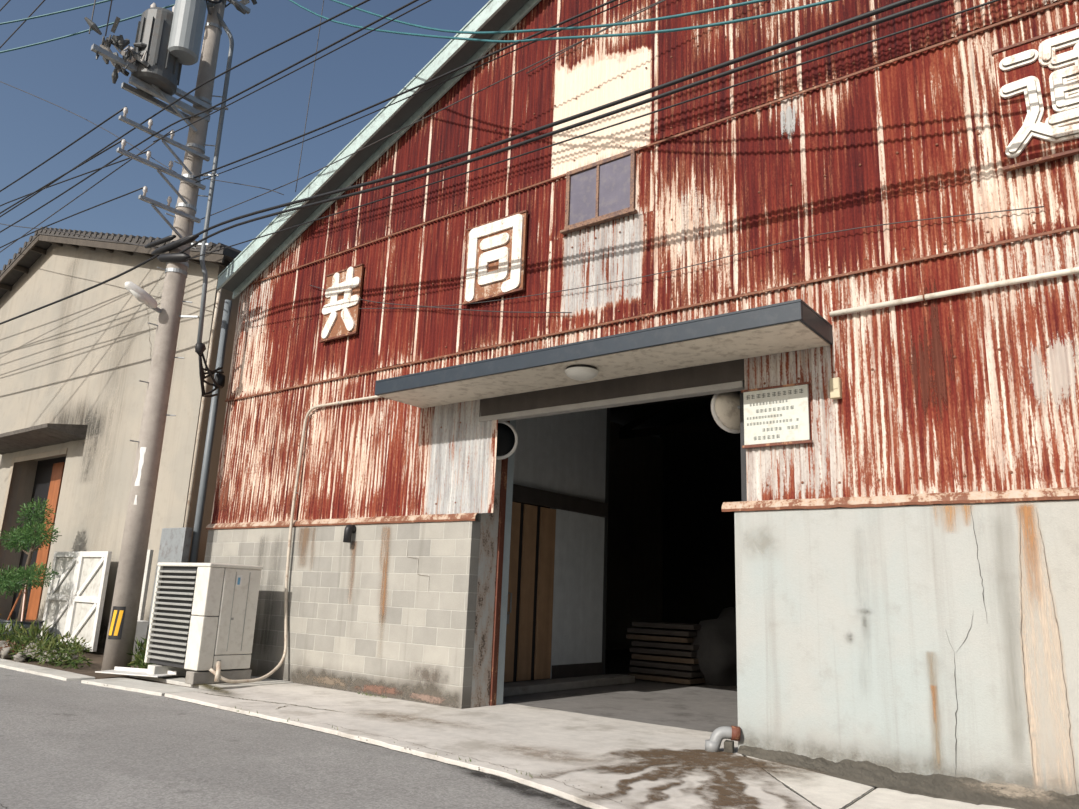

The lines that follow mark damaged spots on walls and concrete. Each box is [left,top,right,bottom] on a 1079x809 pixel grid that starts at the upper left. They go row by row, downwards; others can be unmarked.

rust [904,277,955,424]
rust [216,476,229,511]
damp [463,749,801,809]
rust [928,654,940,765]
crack [945,513,987,777]
rust [1019,505,1065,783]